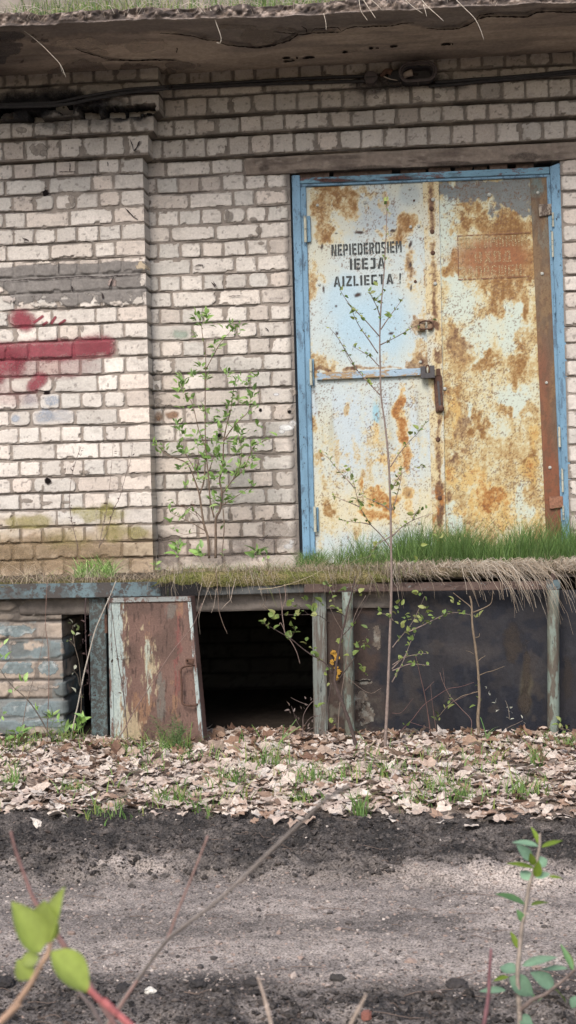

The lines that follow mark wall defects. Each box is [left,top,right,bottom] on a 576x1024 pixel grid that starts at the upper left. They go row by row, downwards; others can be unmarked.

crack [75,11,576,61]
spalling [0,260,149,308]
peeling [0,625,71,727]